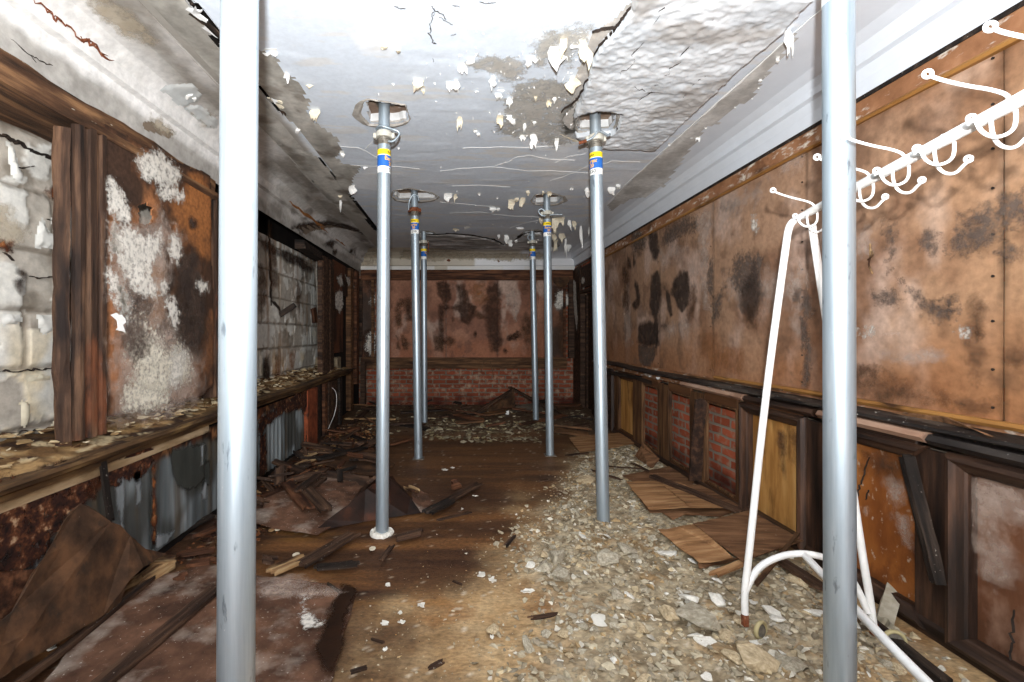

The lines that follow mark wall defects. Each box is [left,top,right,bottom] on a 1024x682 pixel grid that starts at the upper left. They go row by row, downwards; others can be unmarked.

crack [0,133,51,169]
crack [2,252,52,279]
corrosion [34,0,114,61]
mould [105,178,208,414]
water stain [135,152,185,203]
peeling [258,49,368,219]
crack [428,2,496,62]
spalling [489,187,590,258]
peeling [525,3,632,133]
water stain [623,213,775,370]
peeling [607,30,798,211]
corrosion [0,447,158,572]